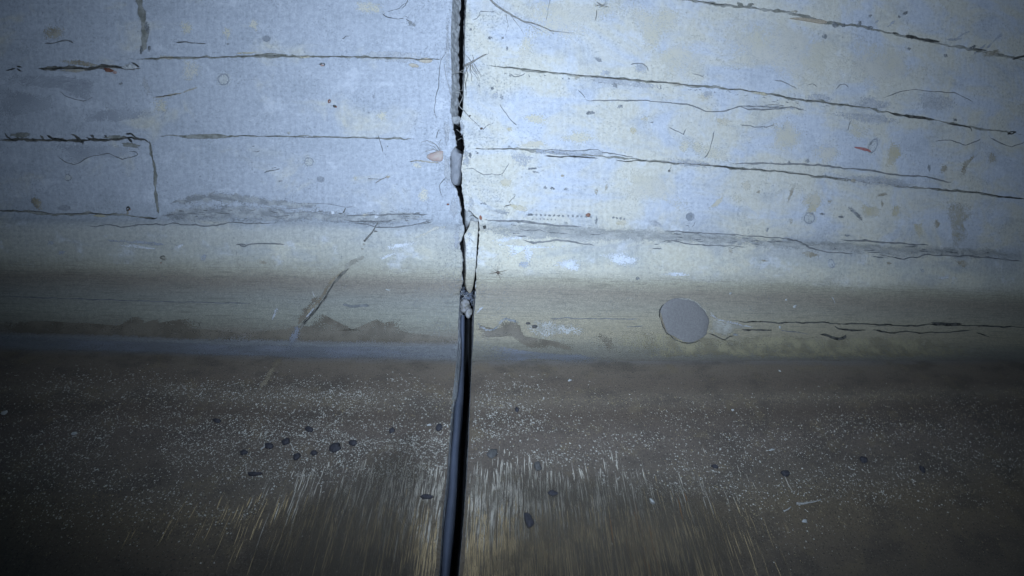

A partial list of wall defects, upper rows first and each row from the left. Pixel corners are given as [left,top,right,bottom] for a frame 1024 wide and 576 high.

crack [434,52,446,138]
crack [889,89,971,101]
crack [578,80,848,158]
crack [439,165,508,197]
crack [735,320,1024,340]